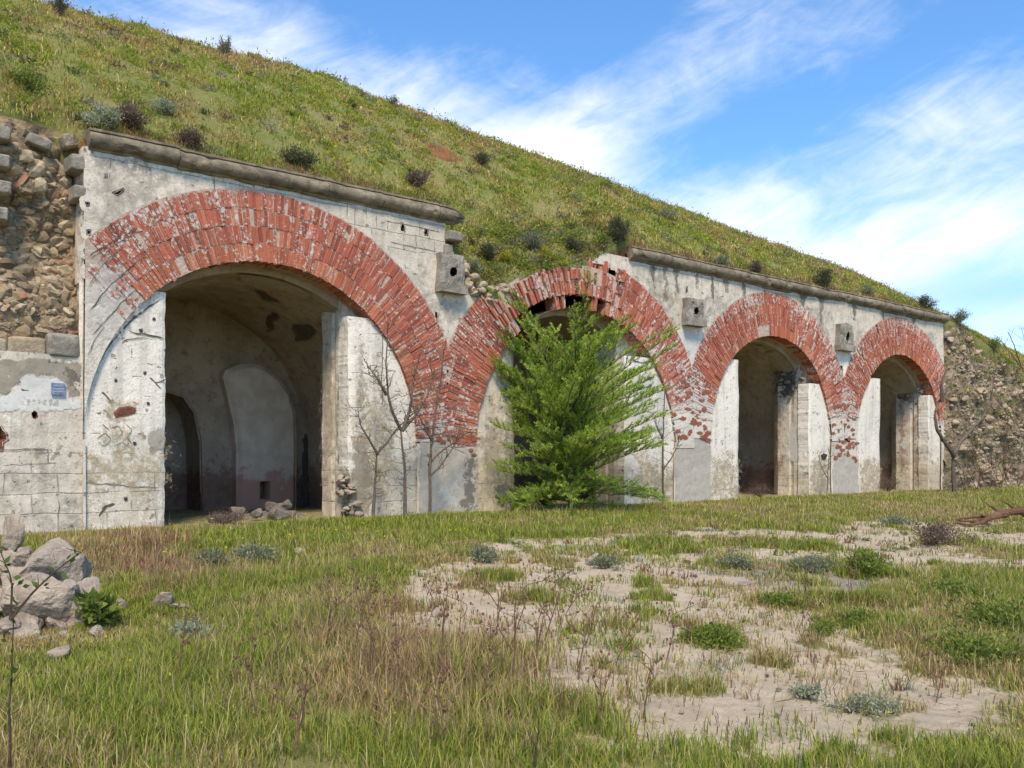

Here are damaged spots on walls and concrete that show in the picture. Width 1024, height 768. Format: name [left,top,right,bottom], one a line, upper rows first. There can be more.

flaking render [0,358,82,397]
spalling [114,402,150,418]